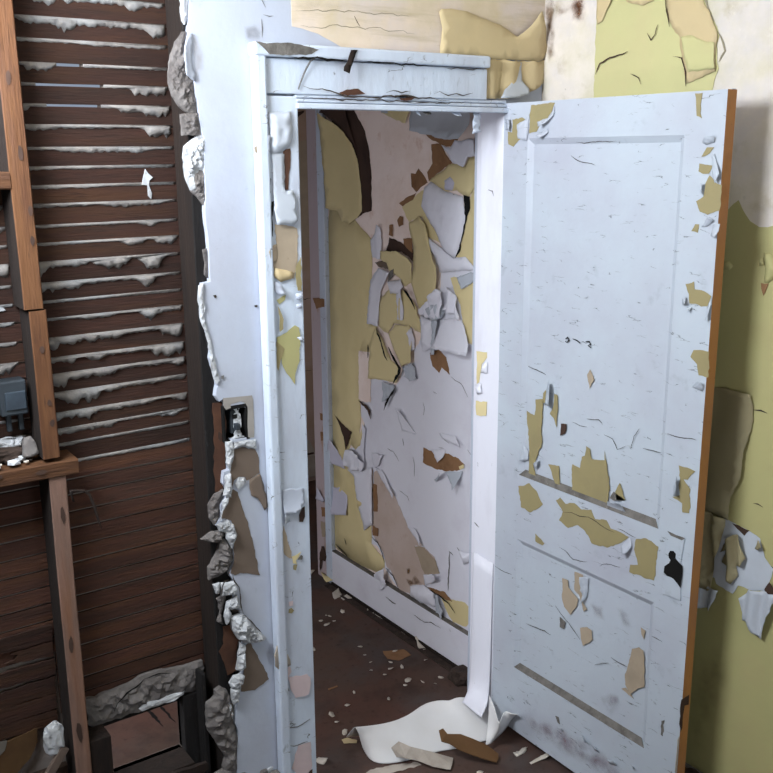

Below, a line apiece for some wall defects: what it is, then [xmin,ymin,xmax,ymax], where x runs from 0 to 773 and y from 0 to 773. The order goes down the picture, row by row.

spalling [167,0,205,206]
crack [298,9,412,34]
crack [292,57,428,66]
crack [297,86,472,104]
flaking render [291,0,545,53]
peeling [332,110,372,217]
peeling [268,111,303,384]
spalling [200,395,269,773]
peeling [518,382,567,512]
peeling [572,446,625,512]
peeling [556,498,658,581]
peeling [697,387,773,639]